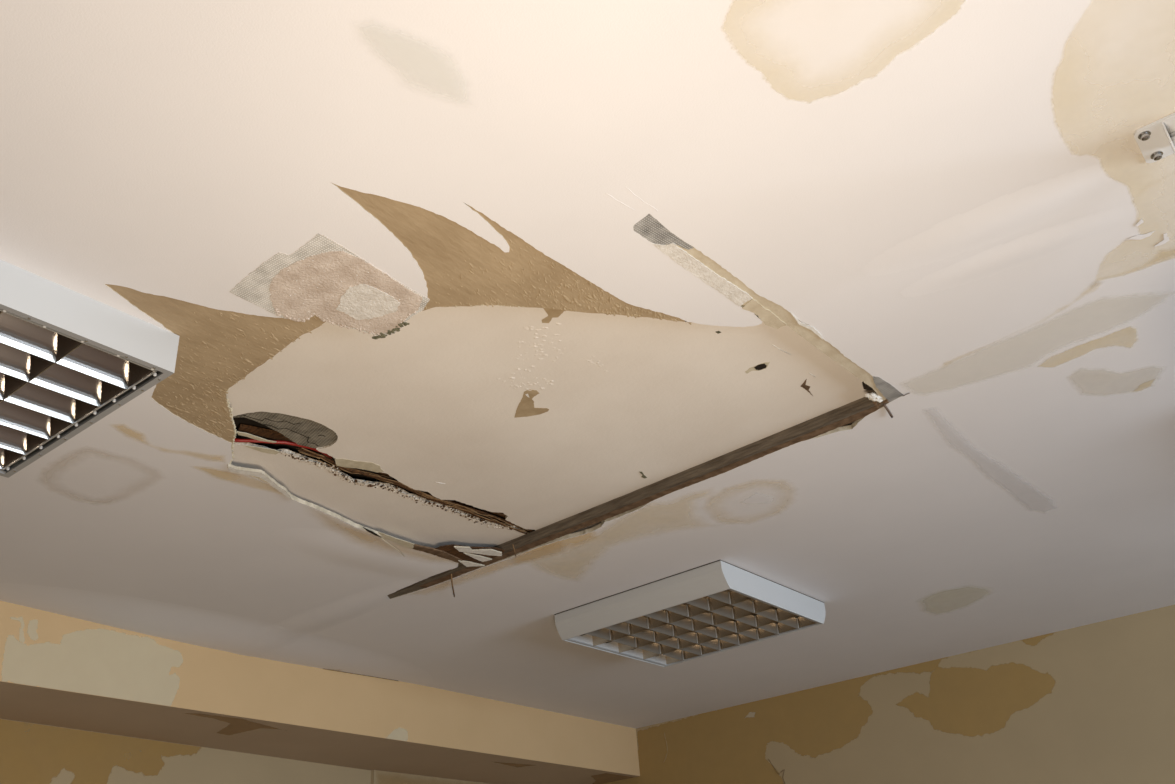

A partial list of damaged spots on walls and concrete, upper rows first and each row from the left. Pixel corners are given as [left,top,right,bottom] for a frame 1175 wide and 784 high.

peeling [335,184,691,325]
peeling [106,284,326,443]
crack [233,412,535,534]
peeling [454,546,502,567]